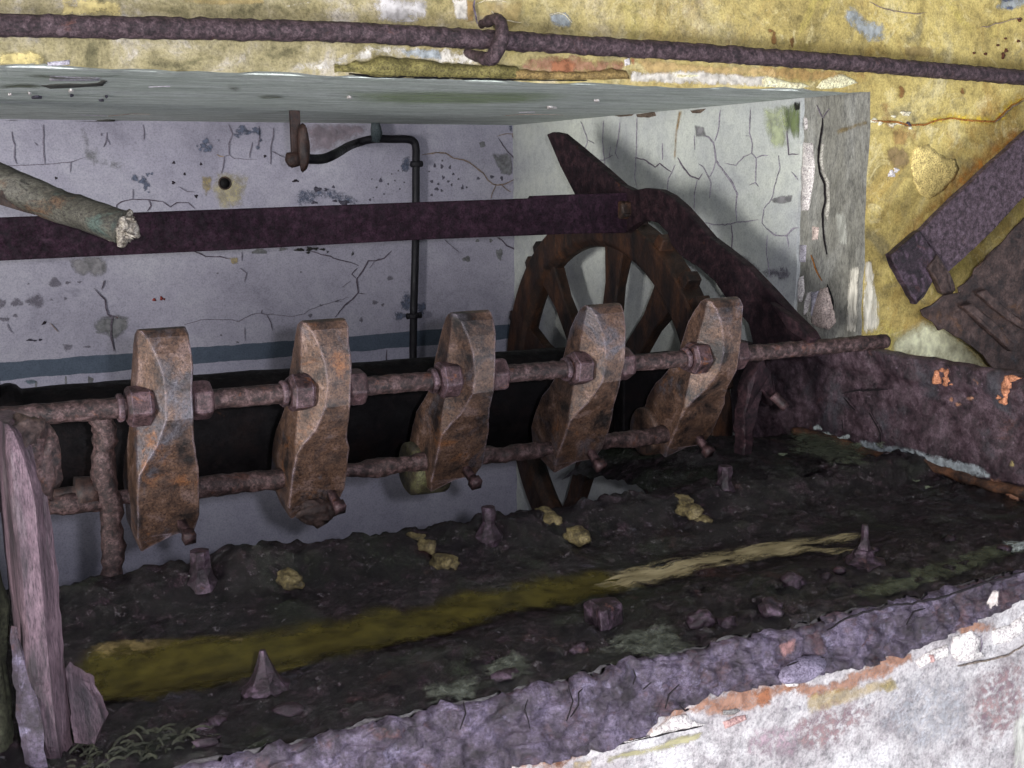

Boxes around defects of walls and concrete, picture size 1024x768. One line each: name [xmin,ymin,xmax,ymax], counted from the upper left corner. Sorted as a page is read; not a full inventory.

crack [872,98,1024,126]
peeling [772,116,815,211]
crack [581,105,830,278]
crack [94,282,117,350]
crack [185,251,391,335]
corrosion [932,368,974,406]
corrosion [996,375,1021,405]
corrosion [987,592,998,608]
peeling [915,614,1024,668]
corrosion [666,641,911,718]
peeling [625,714,705,743]
spalling [722,708,747,729]